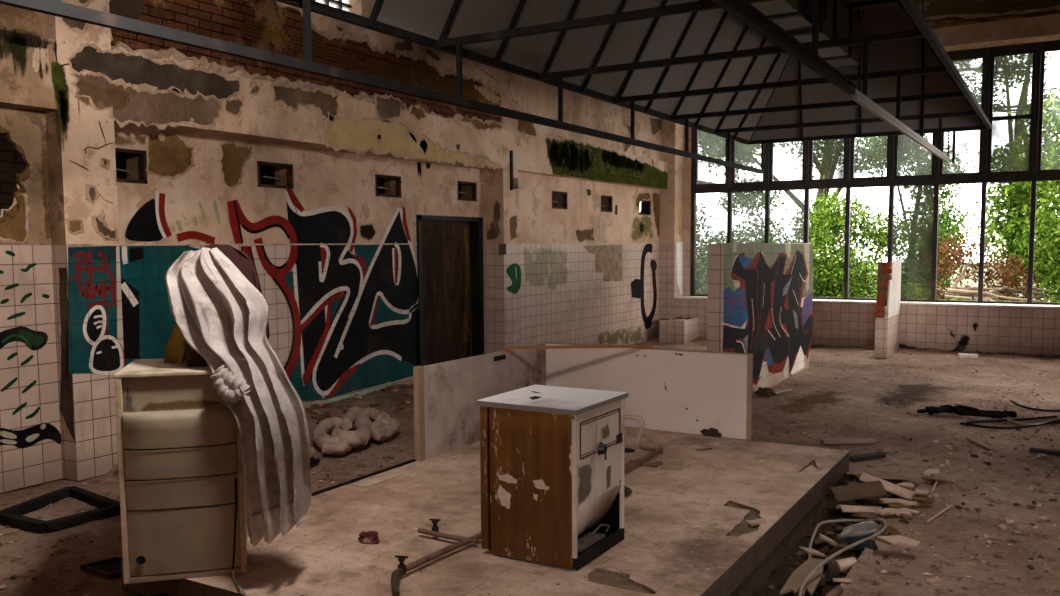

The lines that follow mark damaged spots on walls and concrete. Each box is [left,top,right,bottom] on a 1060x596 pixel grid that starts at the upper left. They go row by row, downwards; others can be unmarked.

peeling [59,17,89,35]
damp [914,0,1060,26]
damp [0,26,56,79]
flaking render [69,0,504,181]
peeling [516,119,536,136]
flaking render [0,124,30,244]
peeling [216,141,252,191]
peeling [584,245,622,282]
peeling [727,503,760,537]
peeling [588,572,652,594]